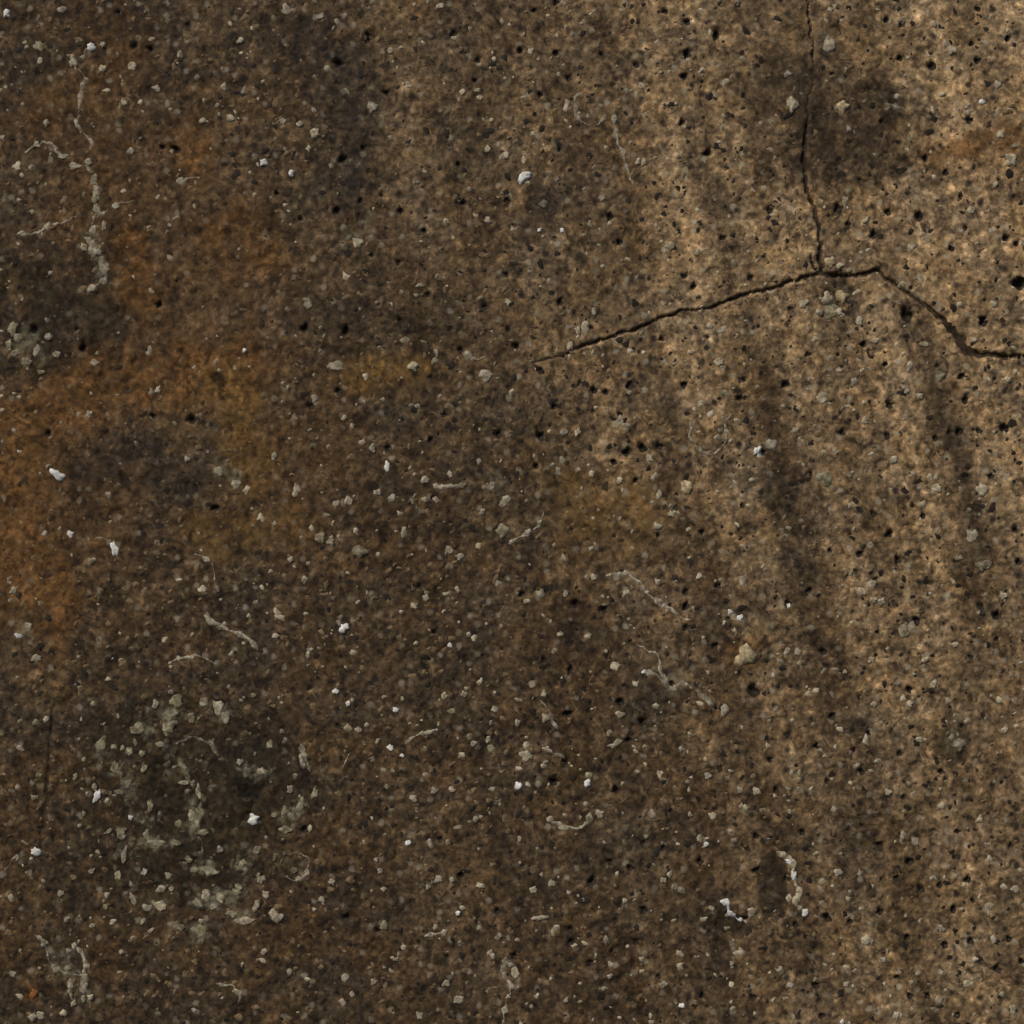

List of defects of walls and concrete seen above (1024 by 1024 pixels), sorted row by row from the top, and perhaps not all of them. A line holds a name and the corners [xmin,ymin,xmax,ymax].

crack [532,0,1024,363]